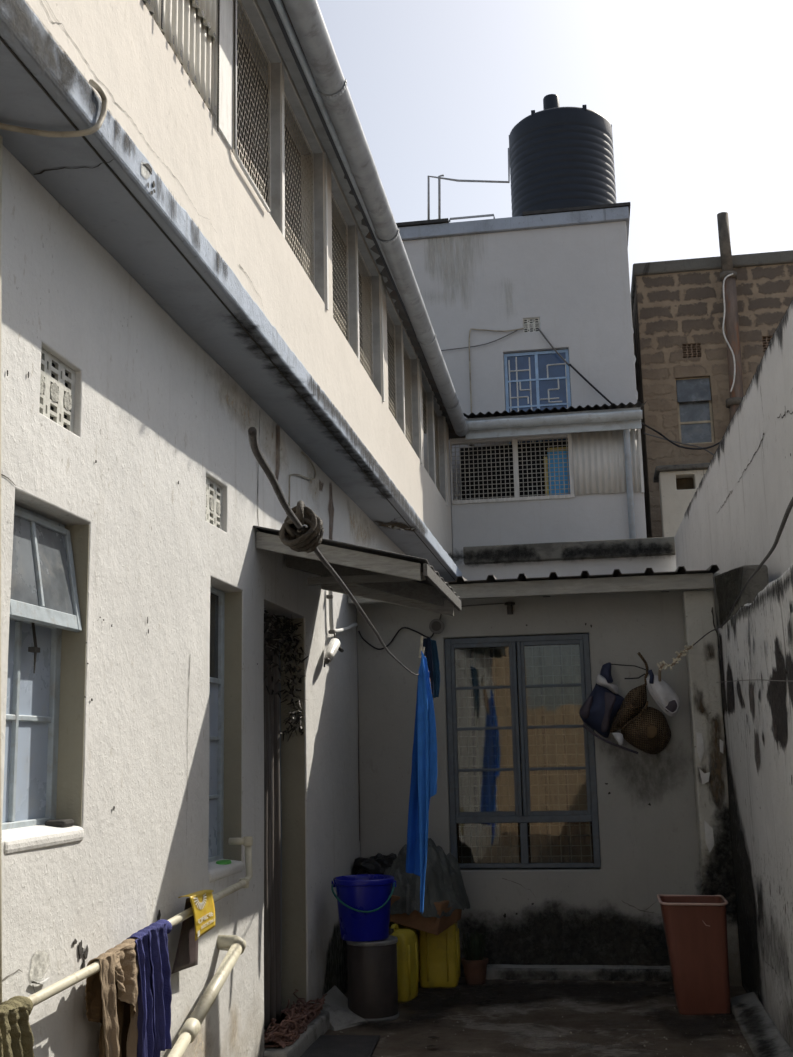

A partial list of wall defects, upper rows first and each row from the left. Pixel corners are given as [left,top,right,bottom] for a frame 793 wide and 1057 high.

damp [0,0,136,154]
crack [34,1,215,230]
crack [719,374,793,510]
damp [715,566,793,651]
damp [358,707,776,1057]